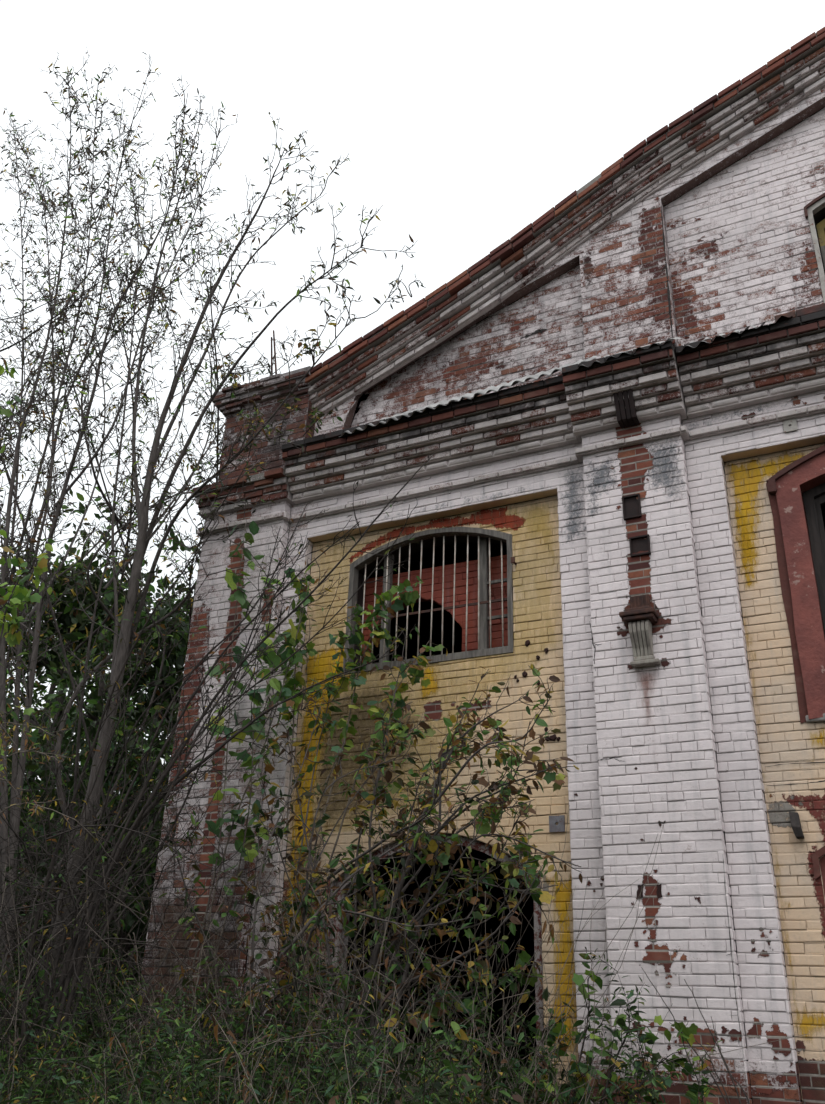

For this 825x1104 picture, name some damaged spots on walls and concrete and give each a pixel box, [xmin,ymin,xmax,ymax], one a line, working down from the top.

spalling [580,251,596,289]
flaking render [632,195,705,341]
flaking render [681,231,729,265]
flaking render [797,238,821,279]
flaking render [435,354,514,382]
water stain [563,462,615,539]
flaking render [610,423,654,509]
water stain [646,445,683,496]
flaking render [617,513,672,638]
peeling [769,788,825,948]
peeling [631,869,687,988]
peeling [632,1016,806,1095]